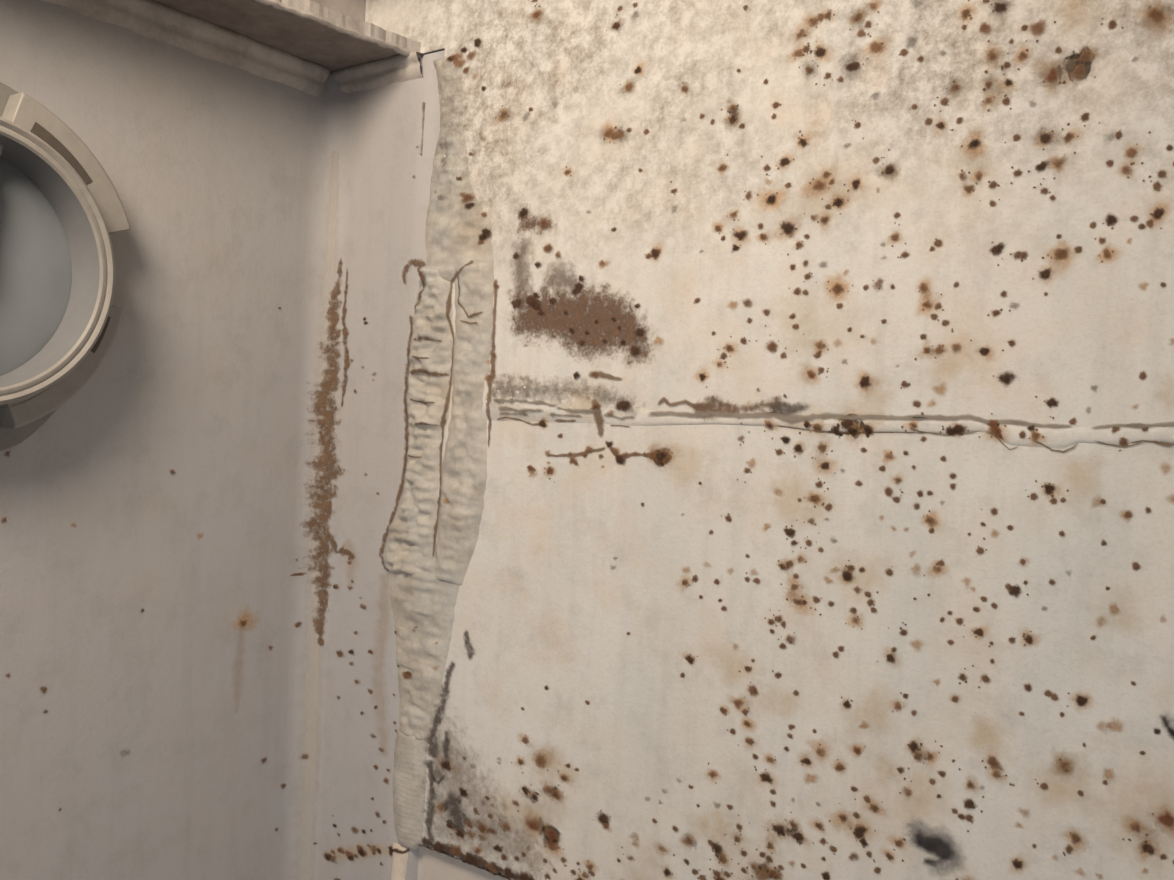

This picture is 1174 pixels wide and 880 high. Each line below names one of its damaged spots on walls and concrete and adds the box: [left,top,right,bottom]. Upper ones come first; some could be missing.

corrosion [447,38,486,90]
corrosion [456,177,490,244]
corrosion [511,207,661,380]
corrosion [787,228,830,295]
corrosion [290,260,375,646]
crack [379,259,575,571]
corrosion [527,399,672,483]
corrosion [658,376,833,459]
crack [610,411,1174,453]
corrosion [422,808,595,880]
corrosion [673,805,806,880]
corrosion [782,787,905,874]